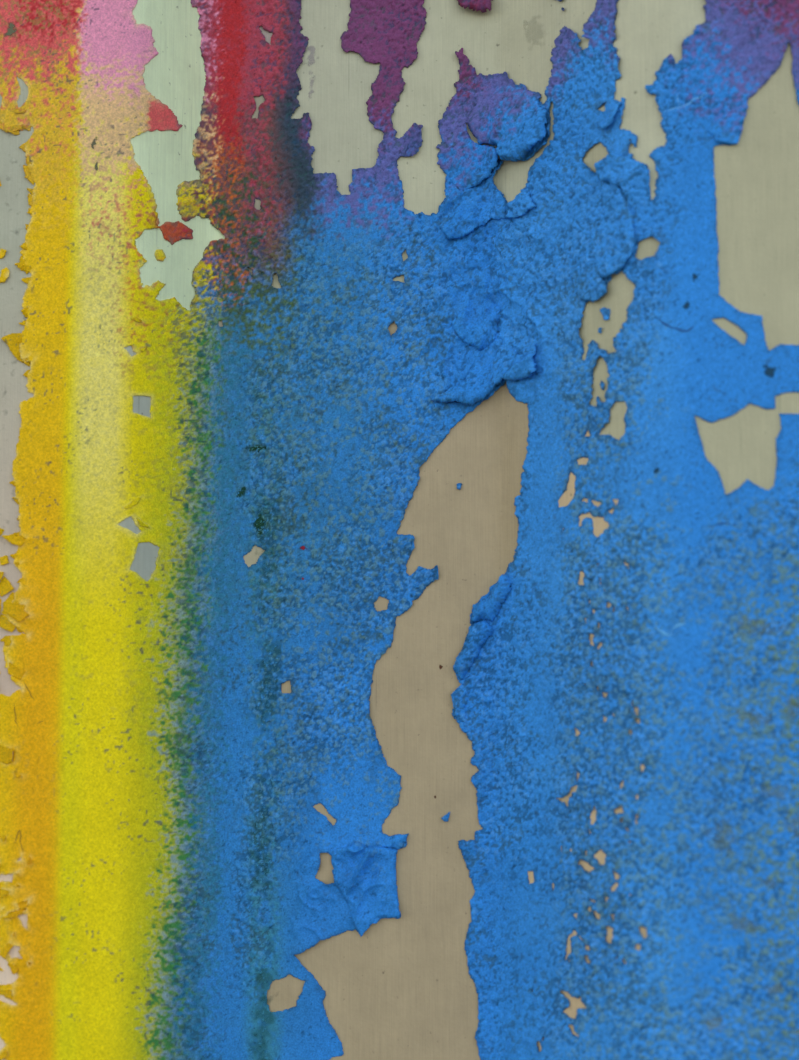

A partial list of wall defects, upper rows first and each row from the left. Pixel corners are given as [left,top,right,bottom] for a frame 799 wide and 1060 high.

peeling [130,0,225,311]
peeling [291,0,597,215]
peeling [583,142,608,172]
peeling [598,0,706,199]
peeling [712,43,799,350]
peeling [0,77,35,709]
peeling [558,457,618,537]
peeling [579,271,635,440]
peeling [695,392,799,494]
peeling [267,382,529,1060]
peeling [0,856,31,1005]
peeling [561,846,620,963]